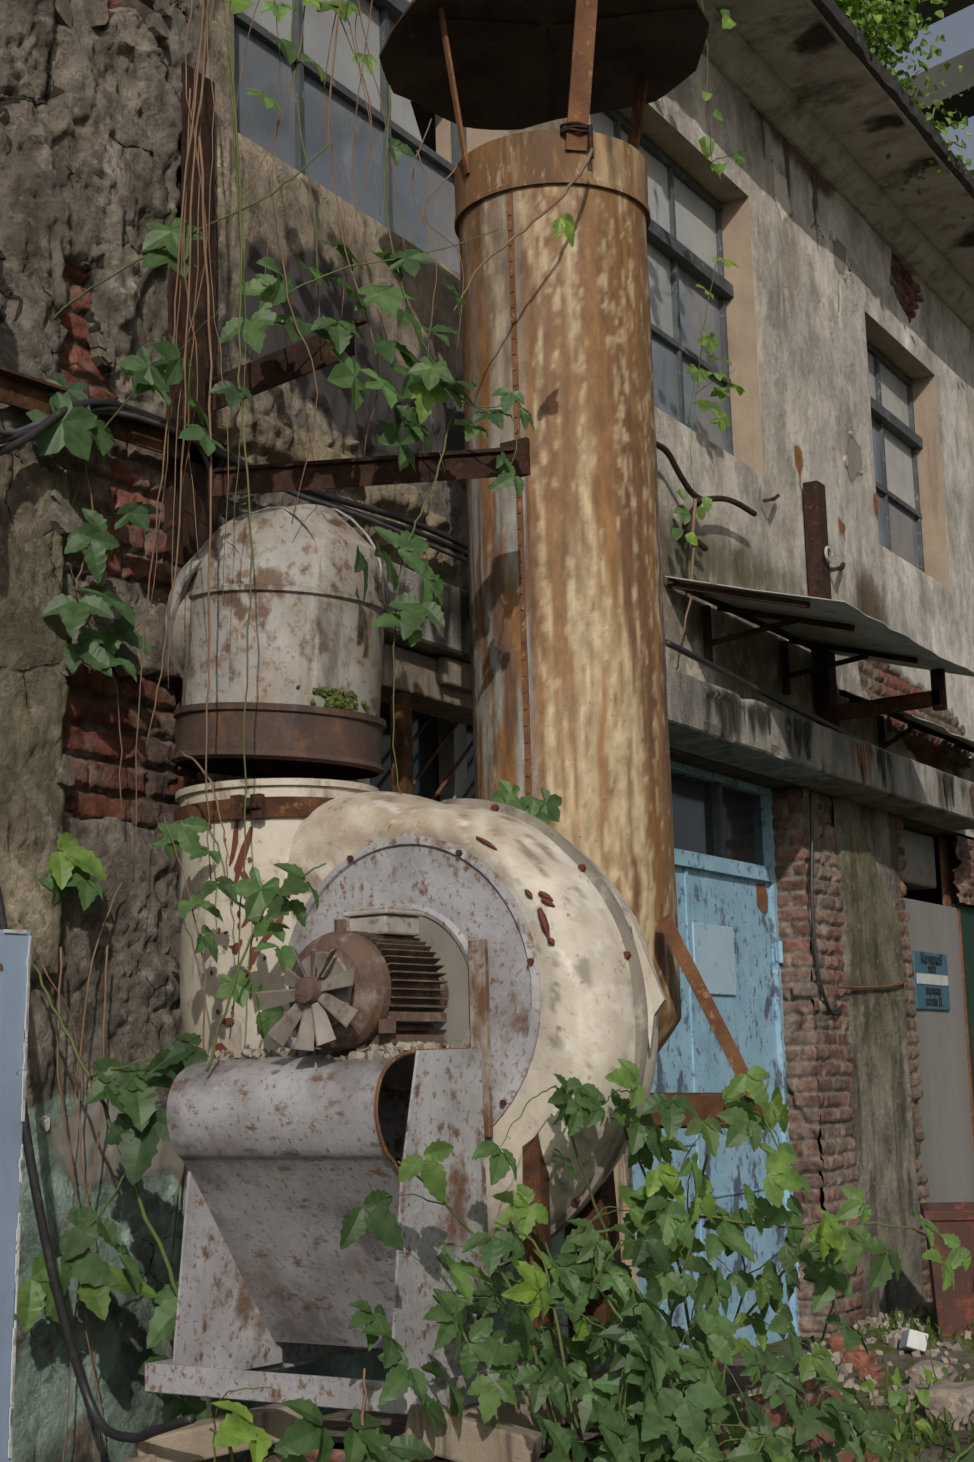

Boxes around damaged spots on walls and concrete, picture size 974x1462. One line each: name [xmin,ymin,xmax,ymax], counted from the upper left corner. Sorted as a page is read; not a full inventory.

spalling [54,0,171,41]
crack [160,50,181,102]
leakage [793,24,838,55]
leakage [865,115,906,133]
leakage [749,101,835,230]
crack [0,137,181,378]
spalling [890,251,925,323]
spalling [48,430,183,604]
spalling [56,640,205,836]
leakage [705,683,811,759]
spalling [858,660,972,779]
leakage [938,773,974,809]